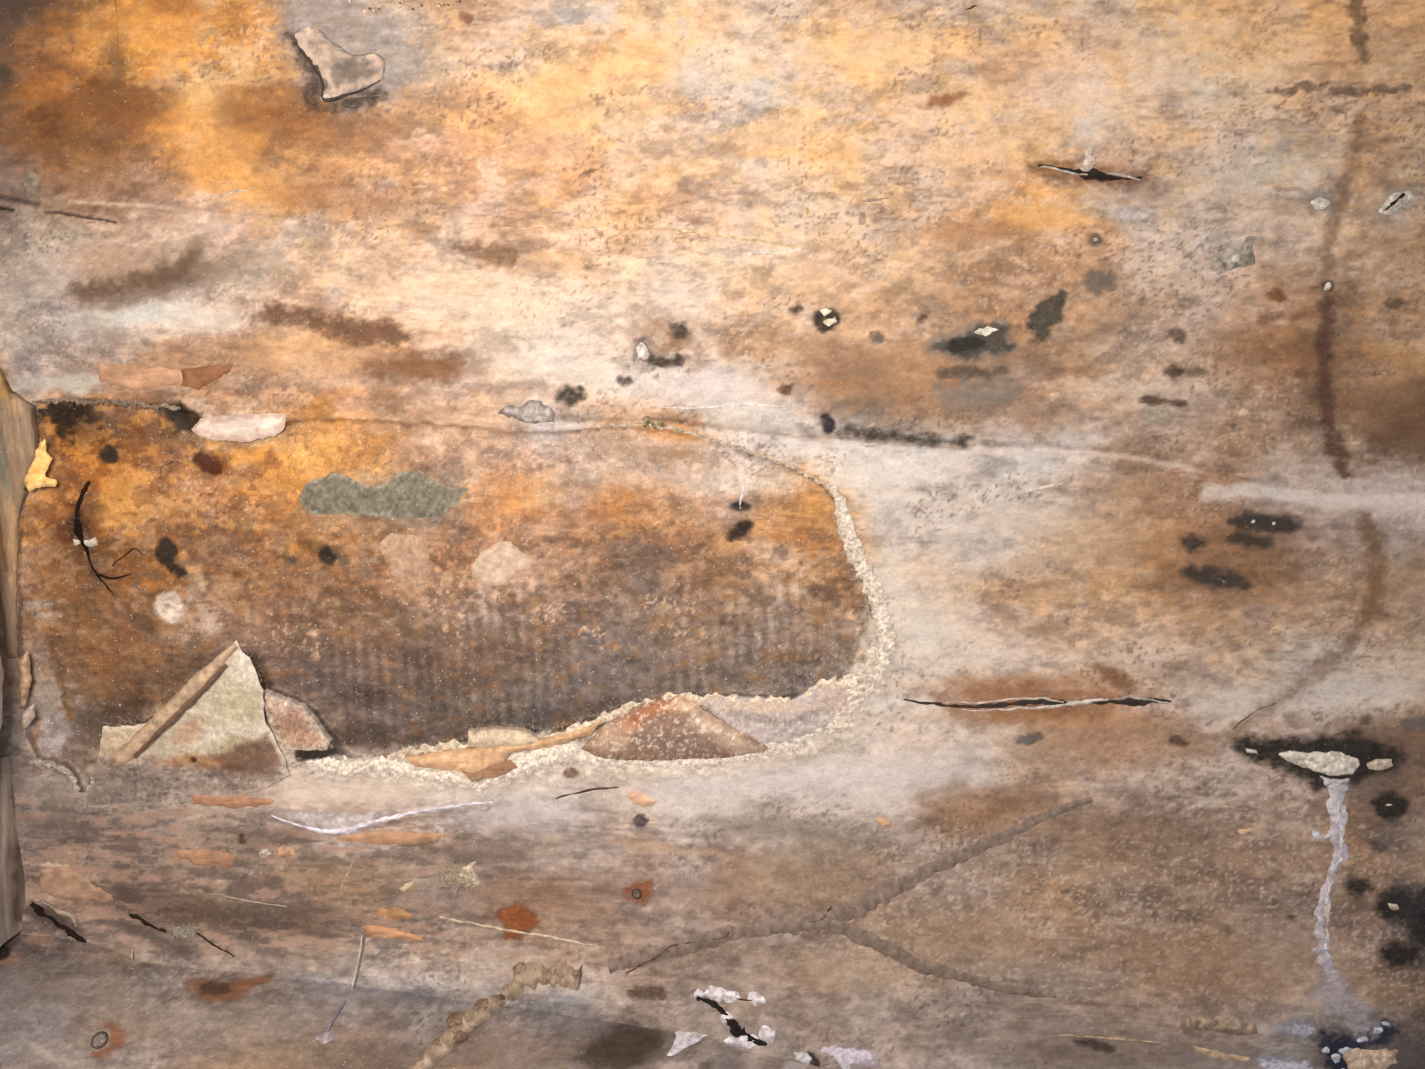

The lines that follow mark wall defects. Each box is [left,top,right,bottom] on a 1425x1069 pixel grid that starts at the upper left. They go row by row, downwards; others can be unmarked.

leakage [1349,0,1370,62]
spalling [293,27,386,103]
crack [1038,142,1145,185]
leakage [1317,295,1352,478]
peeling [191,413,287,443]
peeling [24,439,57,492]
peeling [300,471,469,519]
peeling [83,640,332,809]
peeling [581,693,773,761]
crack [904,682,1172,717]